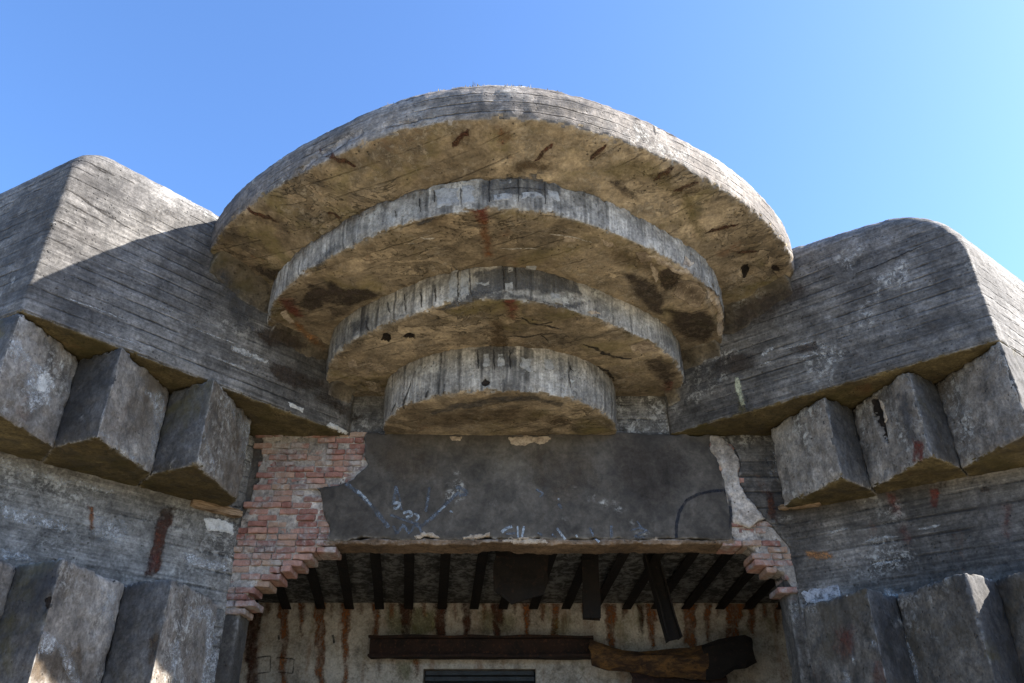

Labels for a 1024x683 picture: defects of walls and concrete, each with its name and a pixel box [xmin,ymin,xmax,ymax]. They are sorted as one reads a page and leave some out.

peeling [508,435,551,446]
corrosion [145,508,175,576]
corrosion [244,603,471,683]
corrosion [483,603,560,636]
corrosion [604,604,657,647]
corrosion [683,603,779,647]